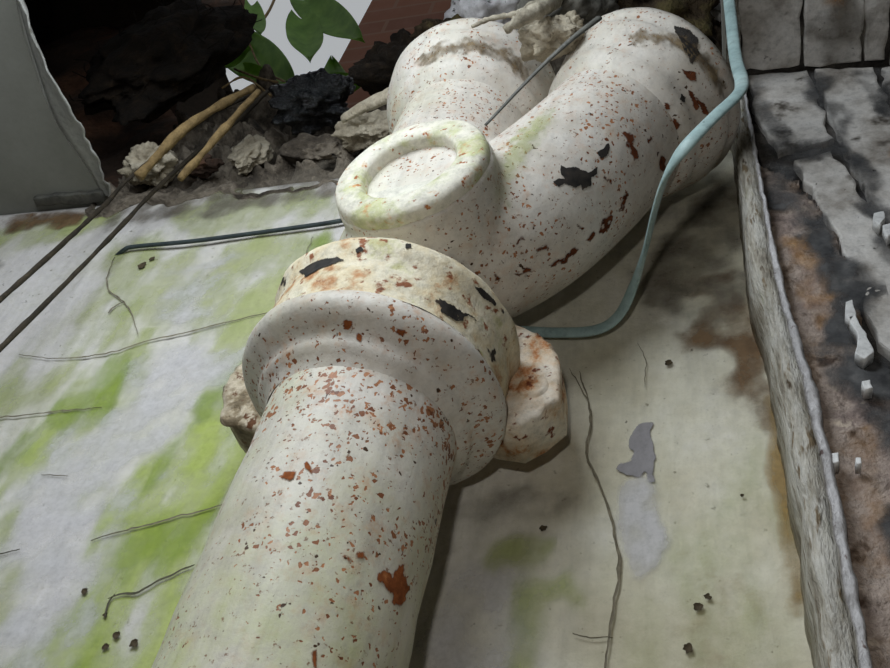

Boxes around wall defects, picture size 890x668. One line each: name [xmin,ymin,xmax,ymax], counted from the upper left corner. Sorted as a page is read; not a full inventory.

peeling [553,143,610,190]
corrosion [343,320,362,341]
water stain [686,297,769,402]
peeling [760,164,890,668]
corrosion [281,462,312,480]
crack [570,370,621,668]
water stain [765,409,792,540]
corrosion [377,564,410,605]